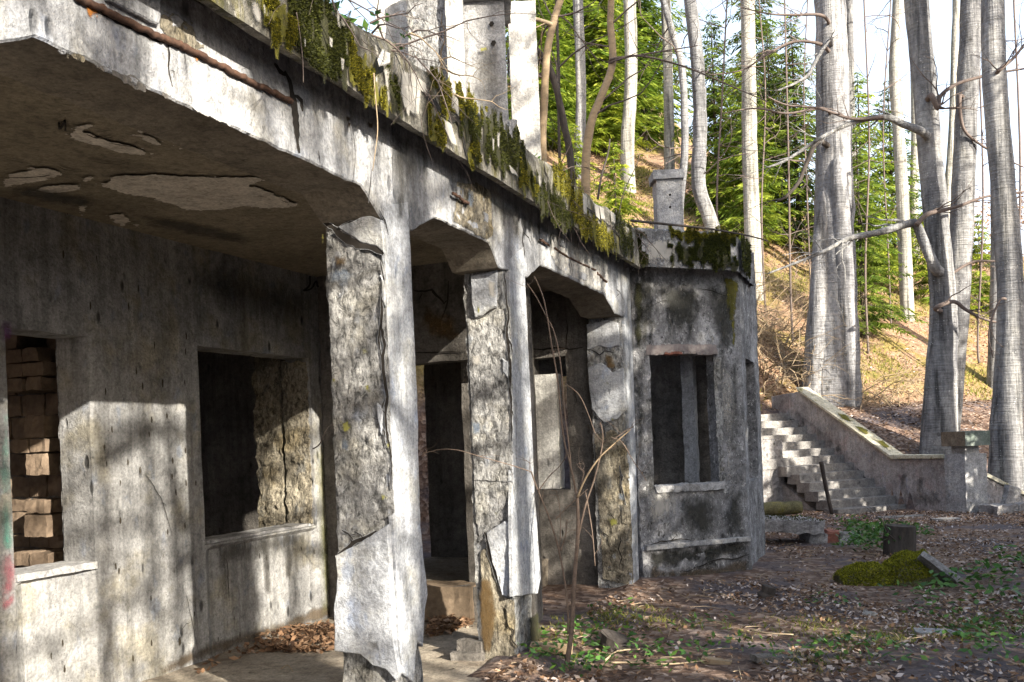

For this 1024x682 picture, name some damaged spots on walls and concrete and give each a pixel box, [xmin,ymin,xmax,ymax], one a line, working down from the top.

rust [75,0,294,104]
peeling [65,124,183,155]
peeling [3,167,297,211]
crack [323,169,393,489]
spalling [327,234,395,551]